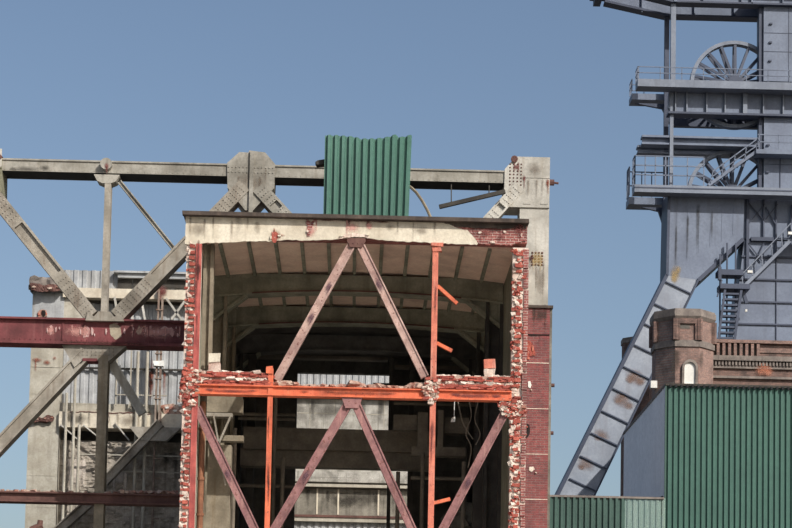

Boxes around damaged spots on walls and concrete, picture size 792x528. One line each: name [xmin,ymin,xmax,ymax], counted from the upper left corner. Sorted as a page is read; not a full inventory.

spalling [452,225,527,246]
peeling [105,323,179,340]
spalling [496,398,530,438]